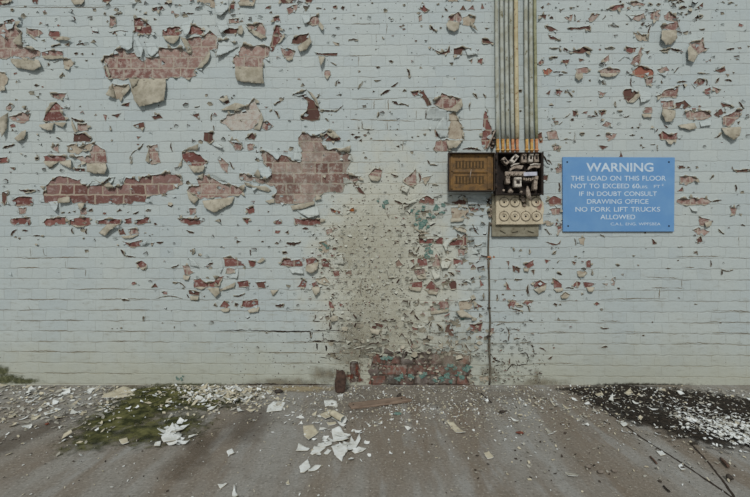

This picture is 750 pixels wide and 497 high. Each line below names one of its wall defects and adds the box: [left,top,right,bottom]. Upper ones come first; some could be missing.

peeling [537,0,750,157]
peeling [0,0,624,385]
peeling [676,165,714,259]